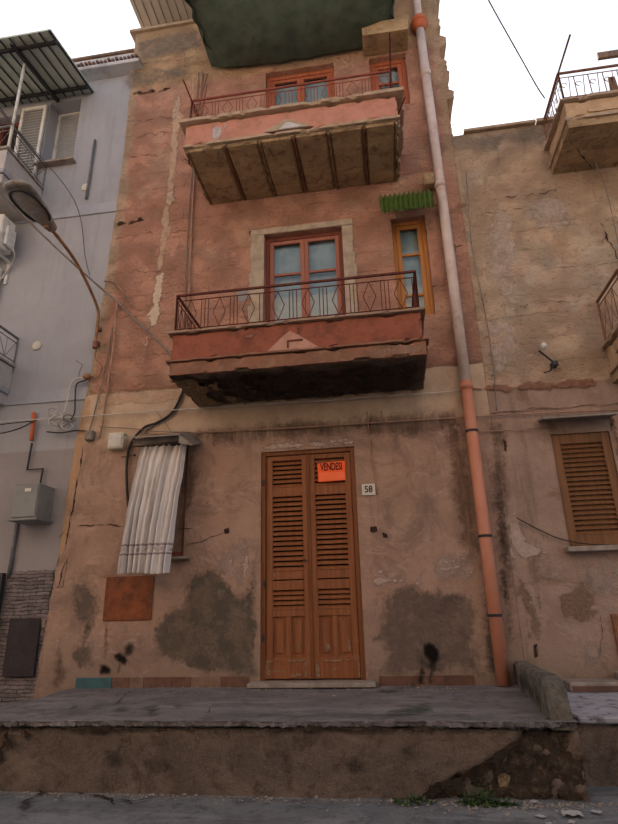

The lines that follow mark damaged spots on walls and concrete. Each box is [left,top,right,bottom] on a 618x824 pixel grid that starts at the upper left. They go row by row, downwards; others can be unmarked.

peeling [146,96,183,346]
crack [53,451,121,589]
peeling [509,521,546,559]
leakage [73,586,96,668]
leakage [154,572,257,675]
leakage [374,585,475,683]
crack [0,728,13,761]
crack [75,791,153,805]
spalling [263,725,442,733]
spalling [436,718,586,801]